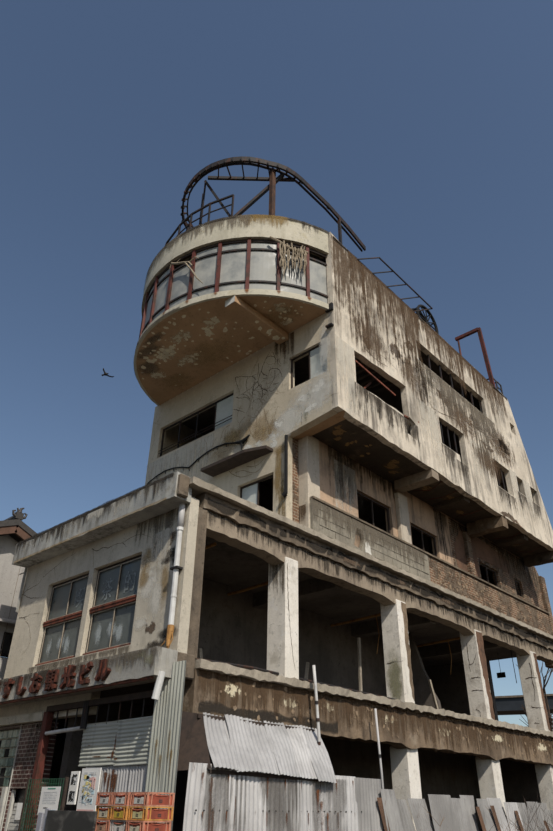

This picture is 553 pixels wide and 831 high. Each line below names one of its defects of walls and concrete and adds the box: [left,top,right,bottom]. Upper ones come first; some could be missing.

peeling [139,309,252,379]
crack [197,352,285,477]
damp [144,214,541,517]
damp [16,434,213,551]
damp [136,506,187,613]
damp [299,446,425,565]
damp [208,498,553,652]
rust [93,738,118,795]
damp [198,669,553,758]